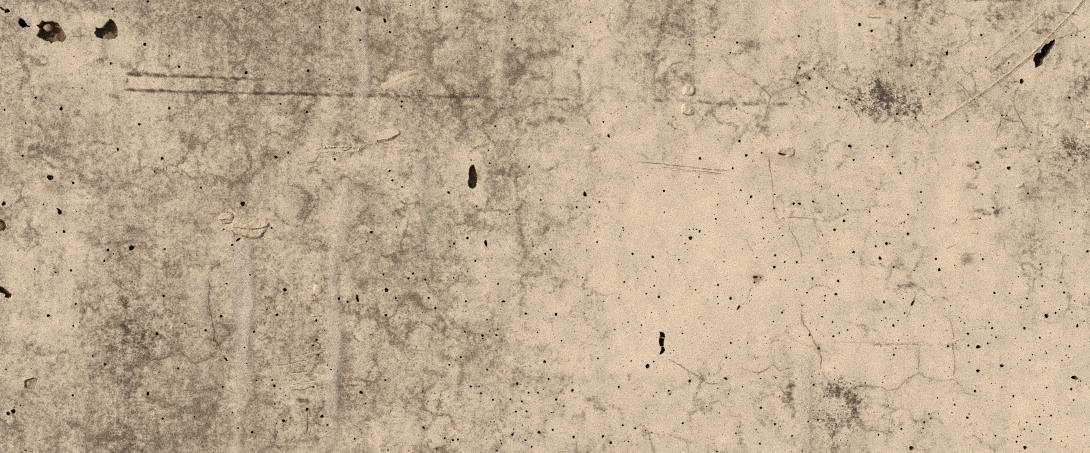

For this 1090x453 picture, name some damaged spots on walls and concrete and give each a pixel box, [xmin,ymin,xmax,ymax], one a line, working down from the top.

spalling [1033,39,1056,68]
flaking render [217,212,269,241]